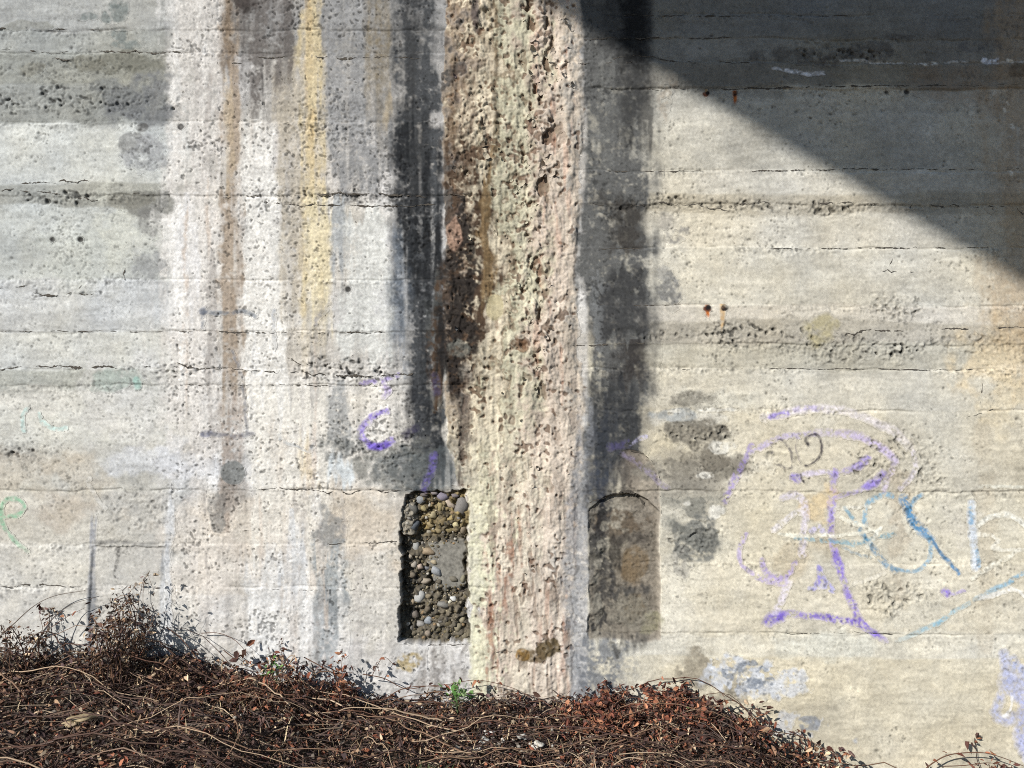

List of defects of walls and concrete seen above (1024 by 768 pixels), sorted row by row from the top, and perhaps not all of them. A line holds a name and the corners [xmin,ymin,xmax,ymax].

damp [18,61,47,77]
damp [60,0,509,701]
damp [556,0,759,712]
rust [703,304,728,332]
spalling [397,488,472,646]